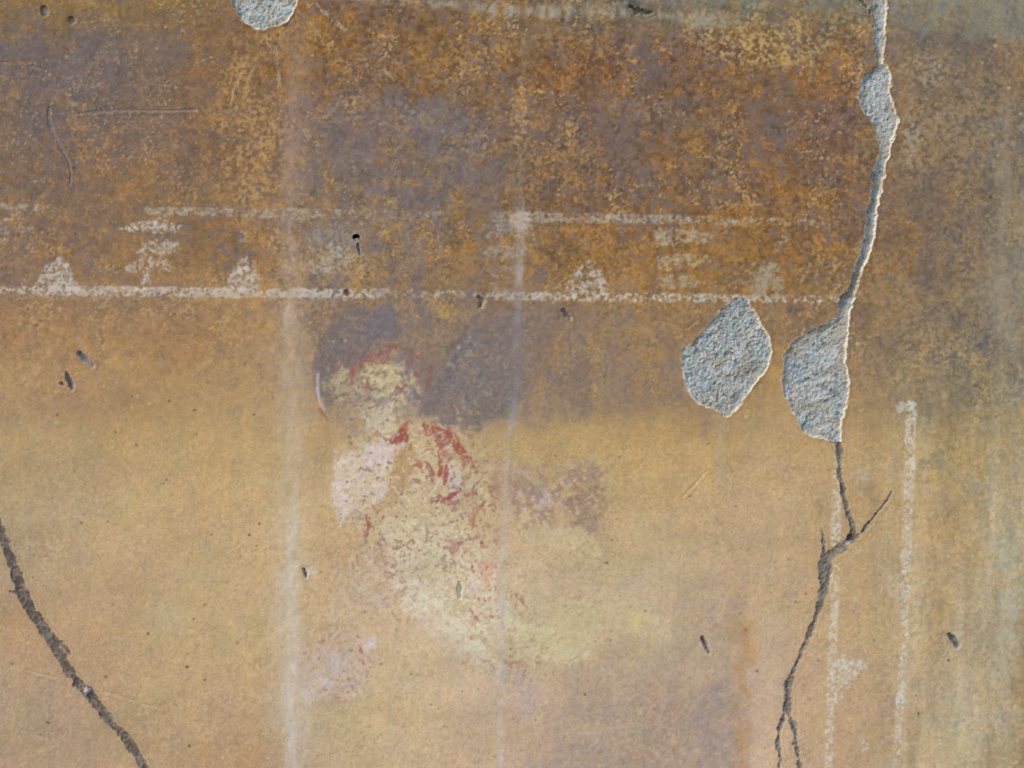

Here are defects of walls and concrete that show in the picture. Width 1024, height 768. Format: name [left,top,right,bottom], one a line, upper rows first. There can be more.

spalling [227,0,300,32]
crack [856,0,891,64]
spalling [855,64,901,136]
crack [832,136,898,316]
spalling [678,292,852,442]
crack [0,511,154,768]
crack [772,442,896,768]